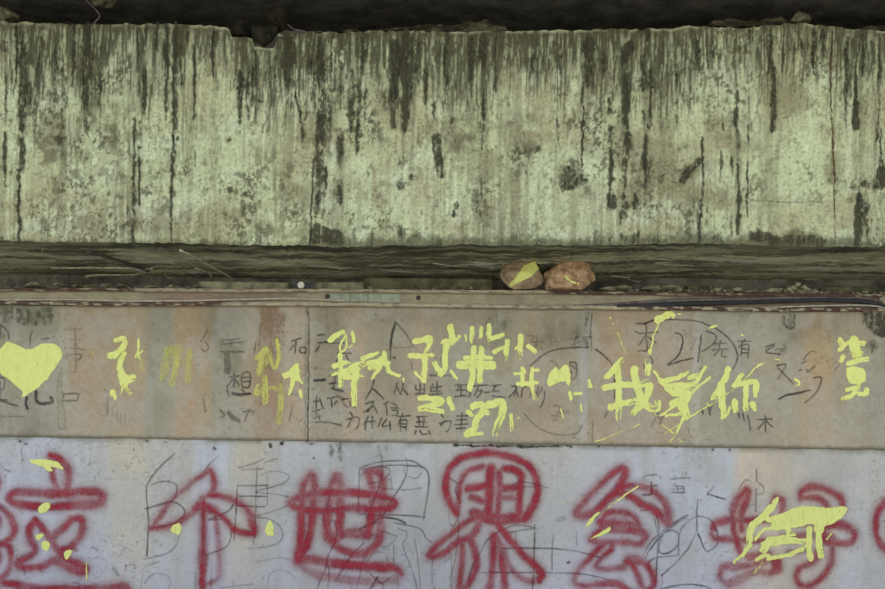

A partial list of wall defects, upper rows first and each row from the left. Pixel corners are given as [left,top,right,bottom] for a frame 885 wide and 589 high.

damp [2,26,40,243]
damp [54,22,102,147]
damp [131,22,197,245]
damp [236,68,263,132]
damp [275,28,445,245]
damp [552,36,607,233]
damp [607,39,654,243]
damp [679,137,705,244]
damp [720,90,750,236]
damp [768,30,784,133]
damp [844,34,865,130]
damp [853,116,885,248]